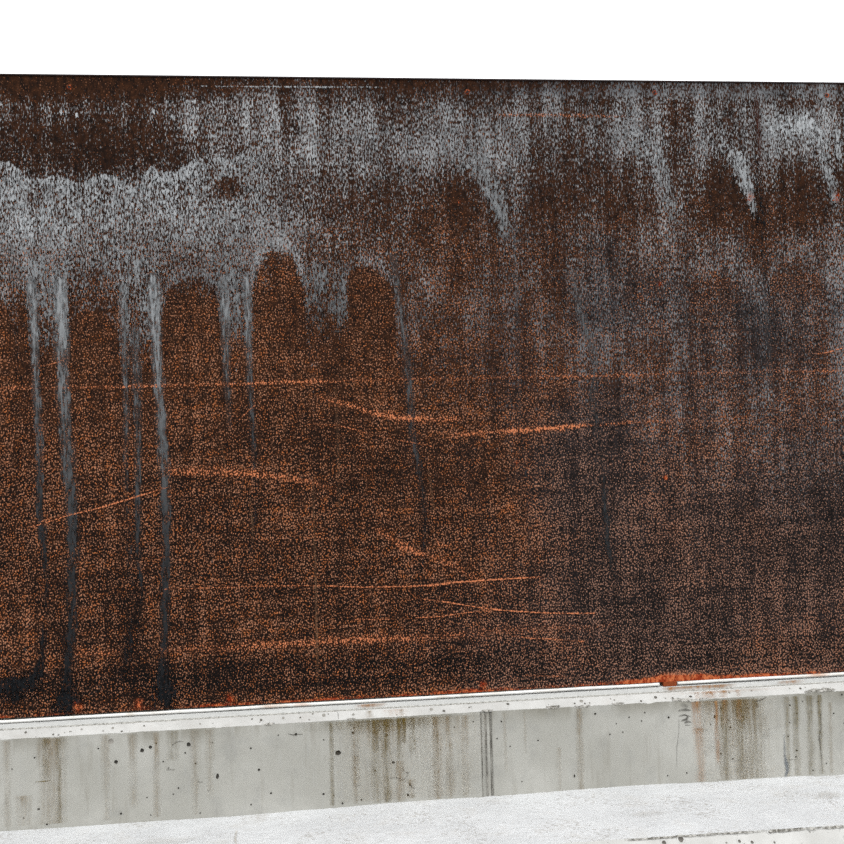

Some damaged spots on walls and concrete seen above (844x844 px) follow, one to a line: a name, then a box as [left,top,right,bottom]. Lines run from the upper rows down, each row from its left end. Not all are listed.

leakage [437,128,515,248]
leakage [301,256,351,338]
corrosion [201,378,371,386]
corrosion [321,397,459,425]
leakage [0,151,307,720]
corrosion [449,420,680,439]
corrosion [169,465,318,484]
corrosion [372,528,478,578]
corrosion [161,578,485,654]
corrosion [264,695,375,706]
corrosion [392,682,531,697]
corrosion [571,670,819,692]